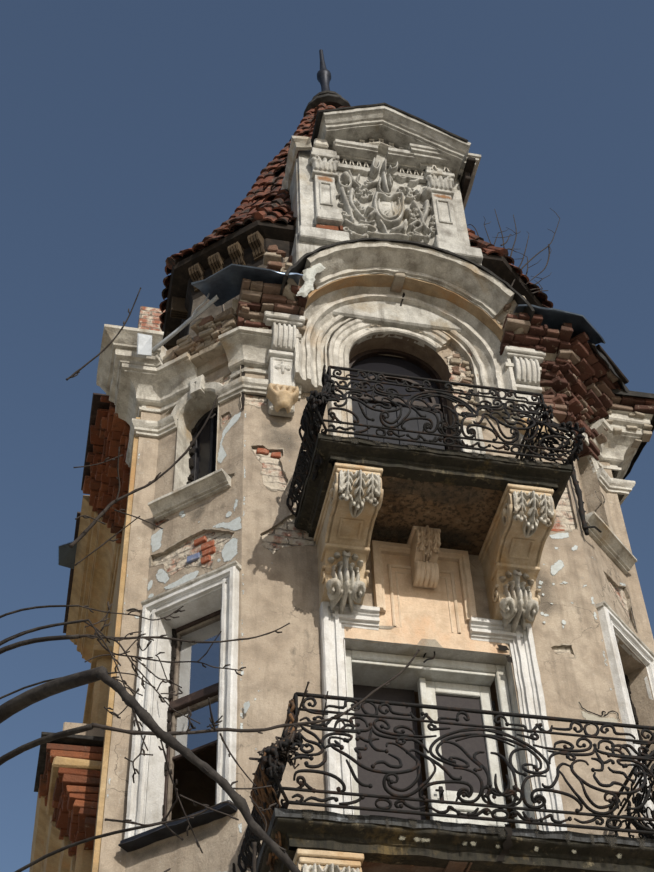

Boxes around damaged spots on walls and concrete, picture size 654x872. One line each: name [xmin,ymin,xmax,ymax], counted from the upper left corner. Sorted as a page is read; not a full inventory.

peeling [217,393,268,463]
spalling [244,440,290,491]
spalling [148,497,245,598]
spalling [260,514,317,554]
crack [578,702,620,721]